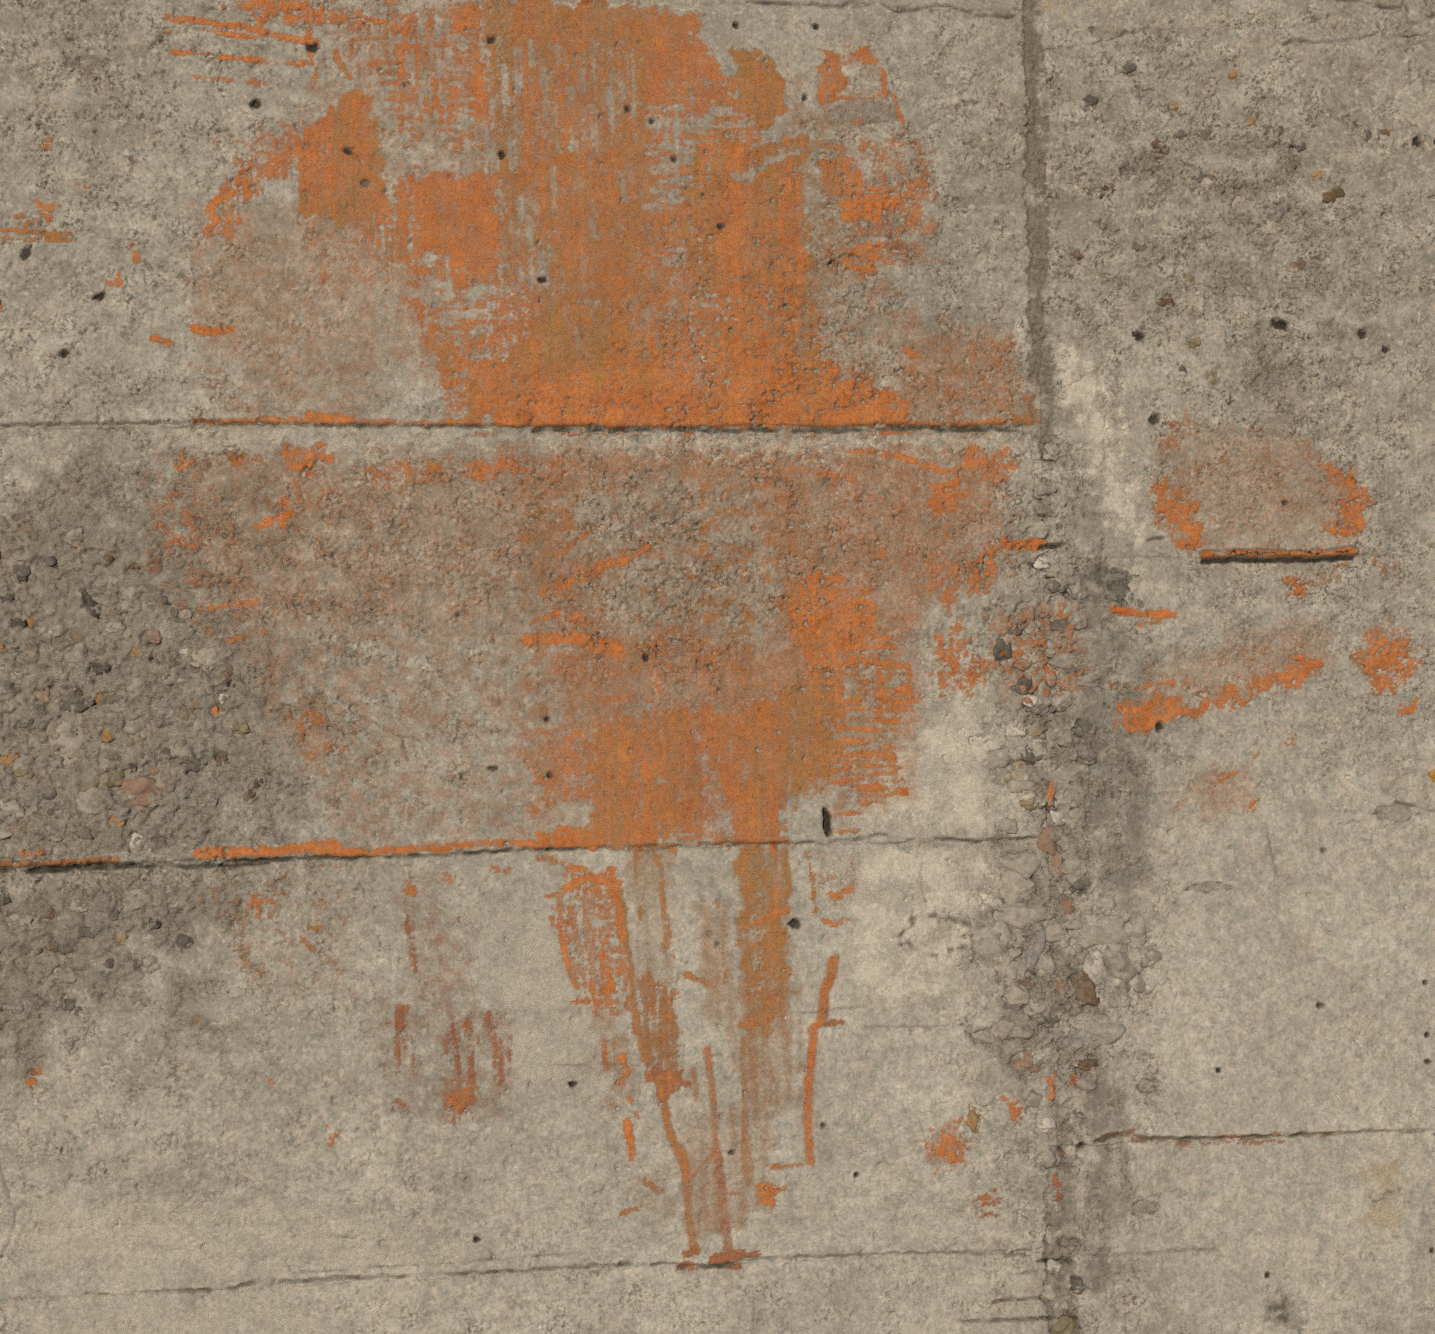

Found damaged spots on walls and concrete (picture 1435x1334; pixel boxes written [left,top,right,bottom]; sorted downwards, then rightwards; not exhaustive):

corrosion [0,221,72,242]
corrosion [402,881,417,897]
corrosion [405,914,418,972]
corrosion [386,1005,415,1075]
corrosion [442,1011,511,1124]